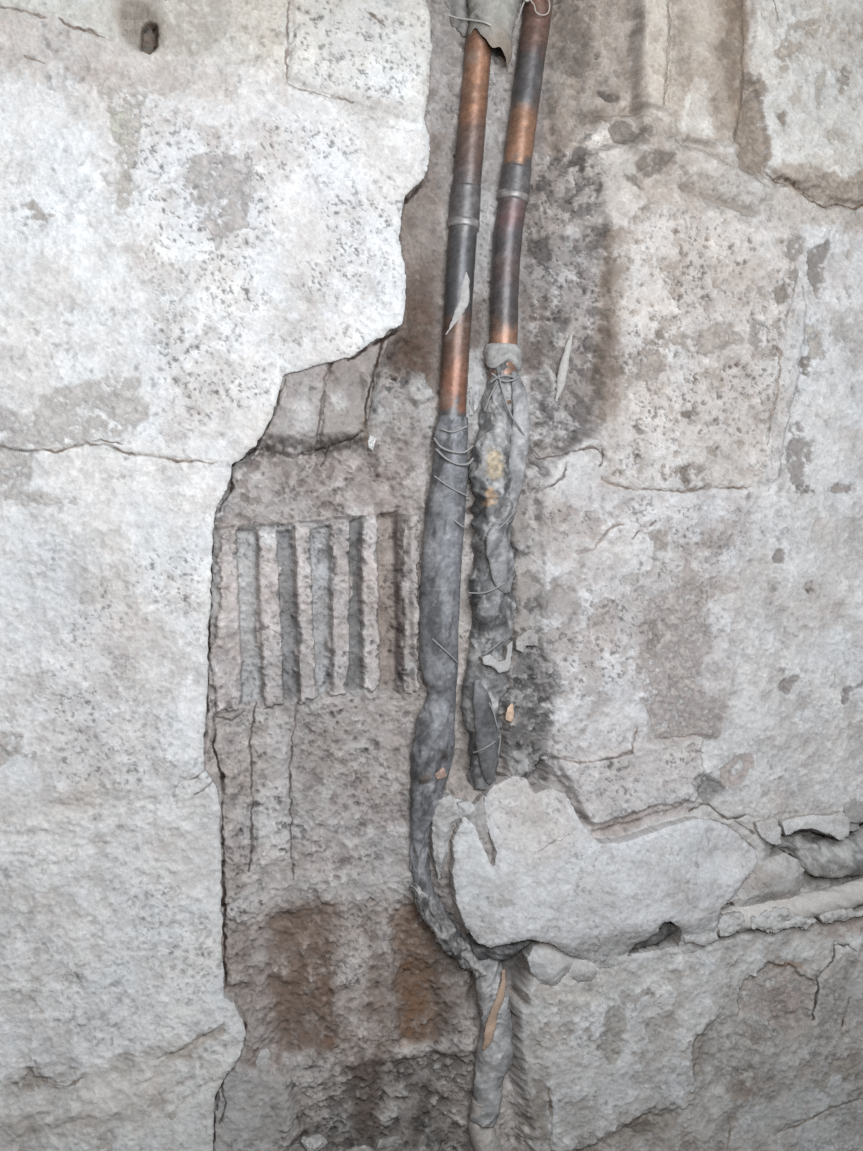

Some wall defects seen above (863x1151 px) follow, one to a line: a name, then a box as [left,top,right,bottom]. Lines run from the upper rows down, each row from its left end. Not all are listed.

crack [769,176,863,210]
crack [0,439,135,455]
flaking render [753,797,863,845]
crack [812,944,856,1020]
spalling [169,1029,224,1060]
flaking render [255,1047,271,1069]
crack [778,1098,863,1132]